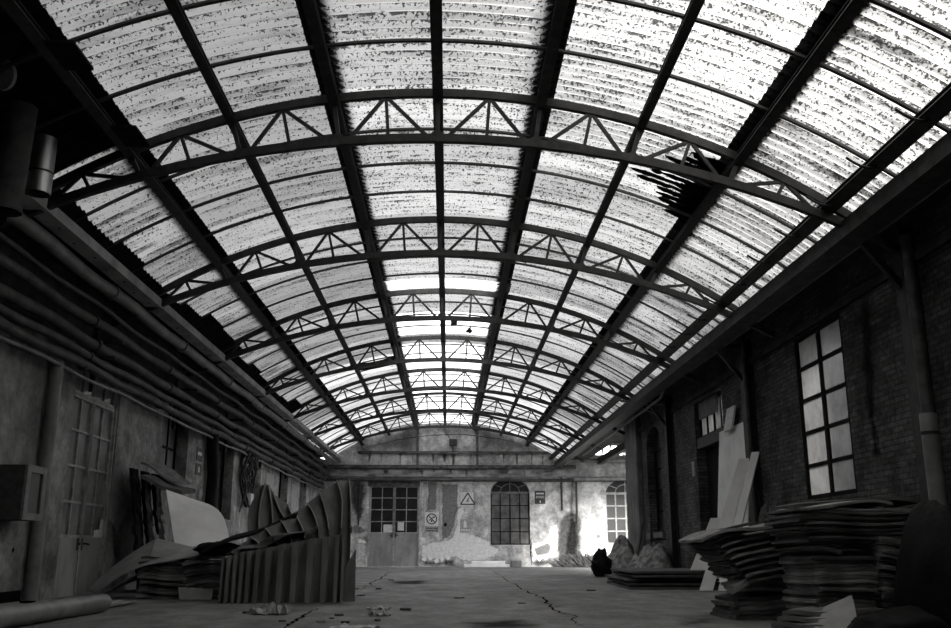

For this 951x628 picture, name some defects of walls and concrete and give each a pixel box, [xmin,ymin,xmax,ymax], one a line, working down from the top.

flaking render [421,507,499,565]
flaking render [532,525,559,565]
crack [489,568,584,626]